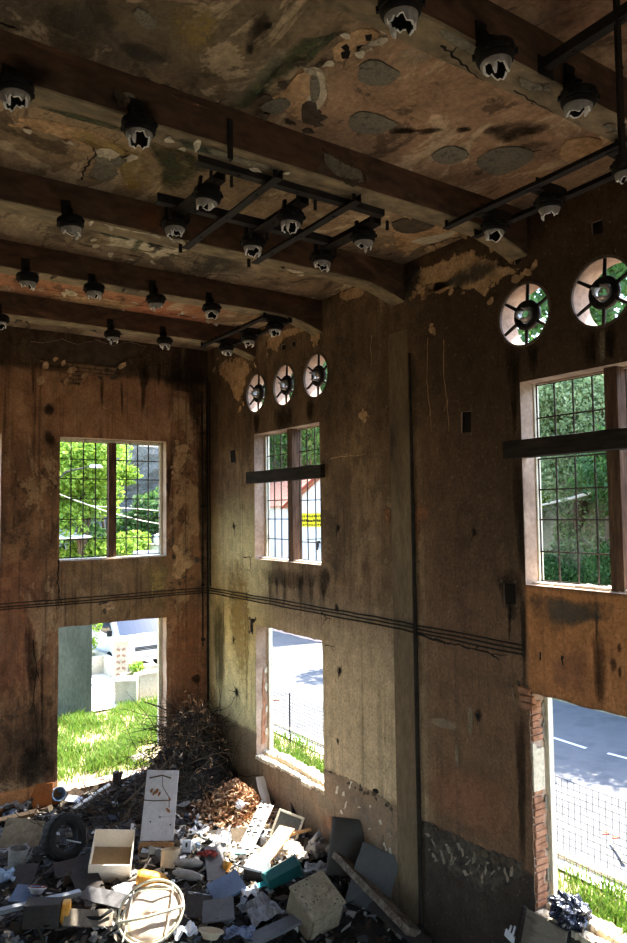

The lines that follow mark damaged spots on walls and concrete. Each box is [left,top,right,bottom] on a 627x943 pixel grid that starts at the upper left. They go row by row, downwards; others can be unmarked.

flaking render [255,28,400,135]
crack [439,45,484,81]
crack [80,147,97,180]
flaking render [317,152,371,187]
spalling [431,146,535,176]
flaking render [384,216,538,305]
flaking render [212,355,256,412]
water stain [514,469,525,569]
water stain [508,598,621,697]
flaking render [324,770,393,854]
flaking render [421,821,523,894]